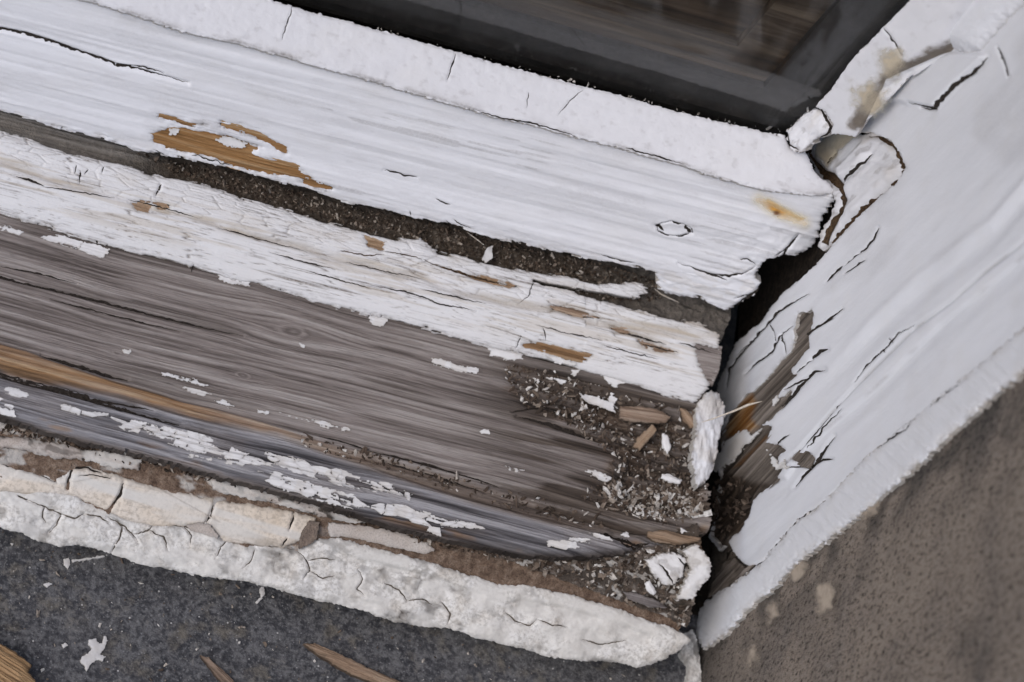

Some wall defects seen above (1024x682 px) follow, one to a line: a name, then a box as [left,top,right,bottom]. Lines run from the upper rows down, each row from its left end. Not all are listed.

crack [0,27,187,82]
crack [915,48,1008,110]
peeling [150,114,332,189]
rust [762,200,803,220]
peeling [488,342,592,384]
peeling [579,376,625,413]
peeling [694,343,722,387]
peeling [60,404,485,538]
peeling [712,312,815,553]
crack [777,404,841,486]
crack [17,464,226,556]
crack [246,515,334,579]